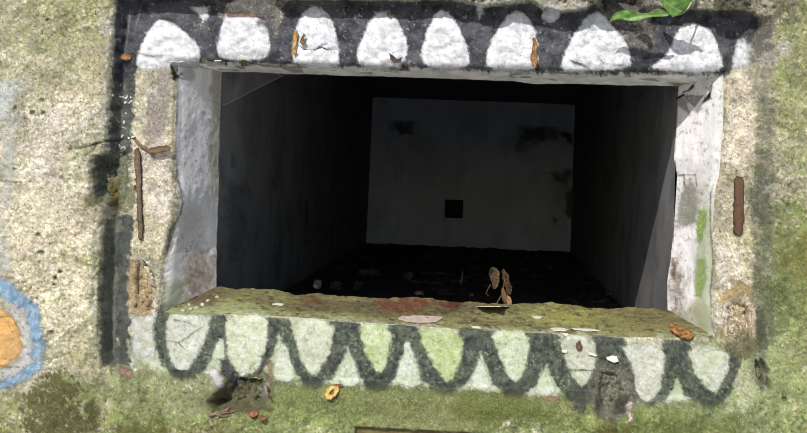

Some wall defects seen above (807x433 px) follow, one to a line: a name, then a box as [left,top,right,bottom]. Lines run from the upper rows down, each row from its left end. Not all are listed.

spalling [216,0,285,35]
spalling [597,0,656,51]
rust [133,148,144,240]
rust [733,176,745,236]
spalling [128,257,159,317]
damp [755,310,767,350]